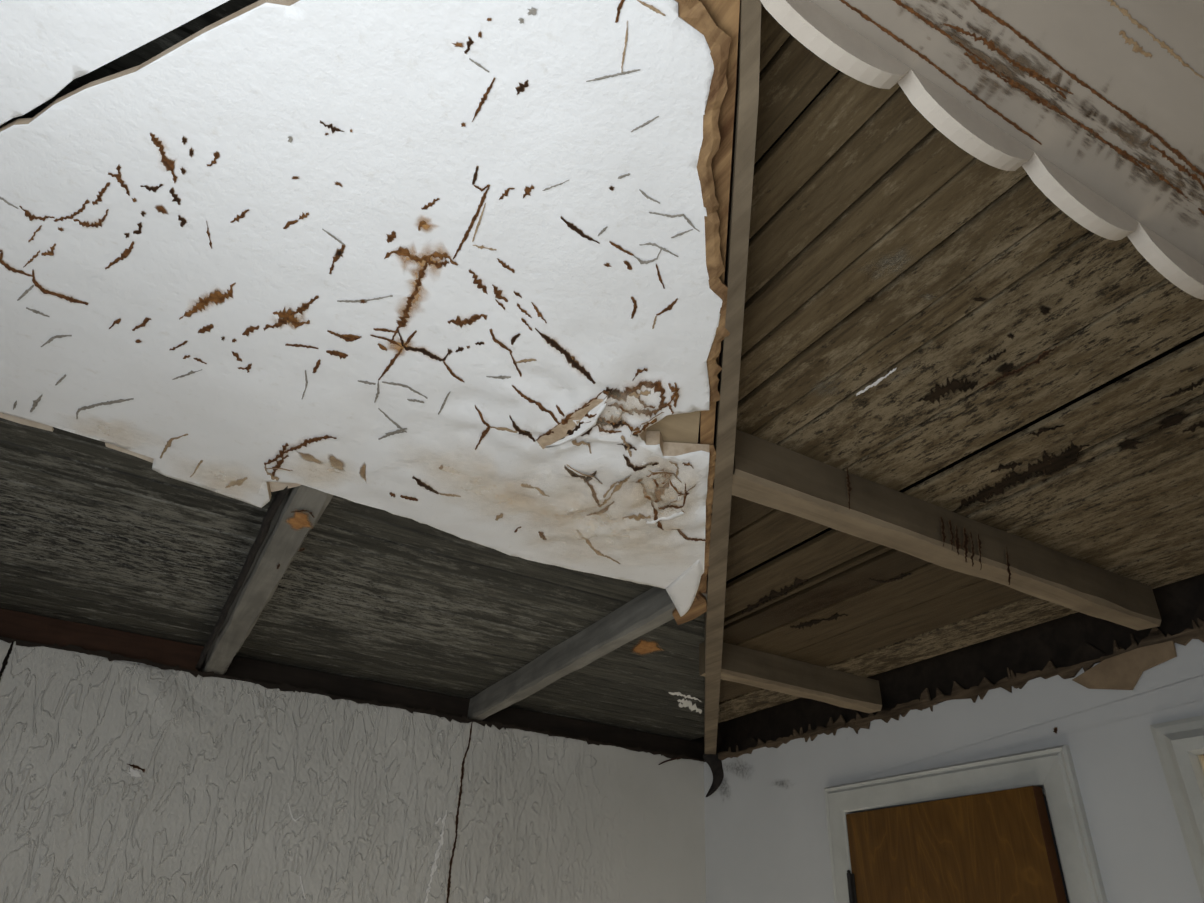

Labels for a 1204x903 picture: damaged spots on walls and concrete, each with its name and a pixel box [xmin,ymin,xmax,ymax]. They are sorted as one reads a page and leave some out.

peeling [905,0,1204,215]
corrosion [418,219,431,231]
corrosion [179,283,236,320]
corrosion [264,296,319,331]
corrosion [384,247,458,344]
peeling [856,368,897,396]
peeling [264,435,337,481]
peeling [536,368,696,530]
crack [0,641,14,680]
spalling [633,640,661,654]
peeling [669,692,702,714]
crack [446,722,473,903]